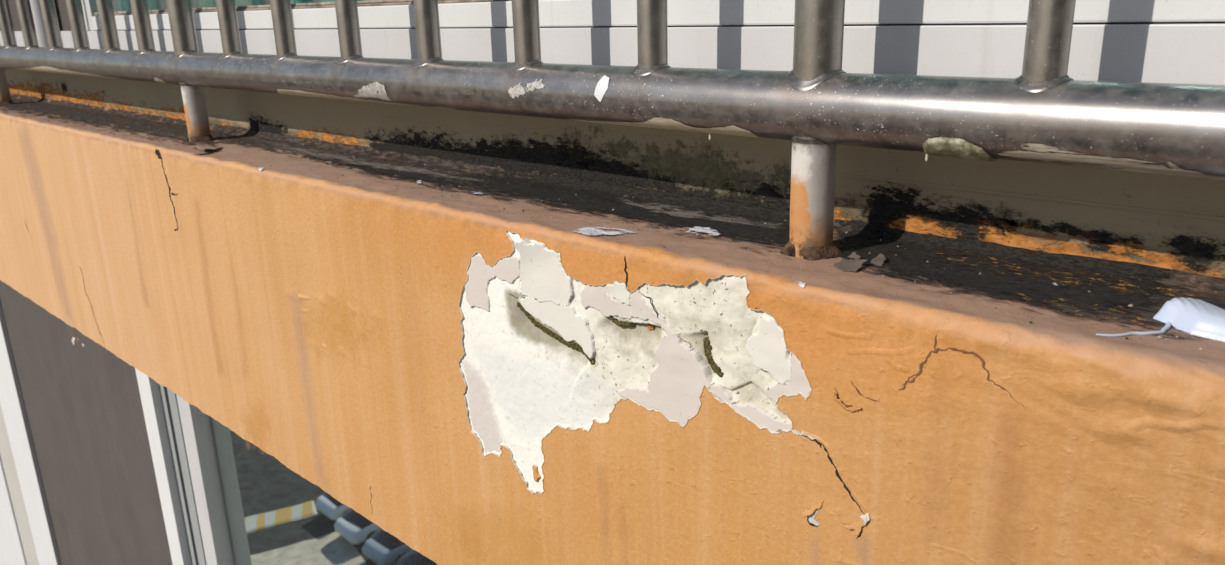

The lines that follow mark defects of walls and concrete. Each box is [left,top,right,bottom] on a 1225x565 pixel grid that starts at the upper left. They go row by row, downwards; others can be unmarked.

corrosion [8,79,186,120]
crack [155,149,178,231]
leakage [0,94,791,249]
leakage [832,182,1225,339]
corrosion [889,215,1225,325]
peeling [458,230,812,494]
crack [898,335,1024,407]
crack [791,428,870,538]